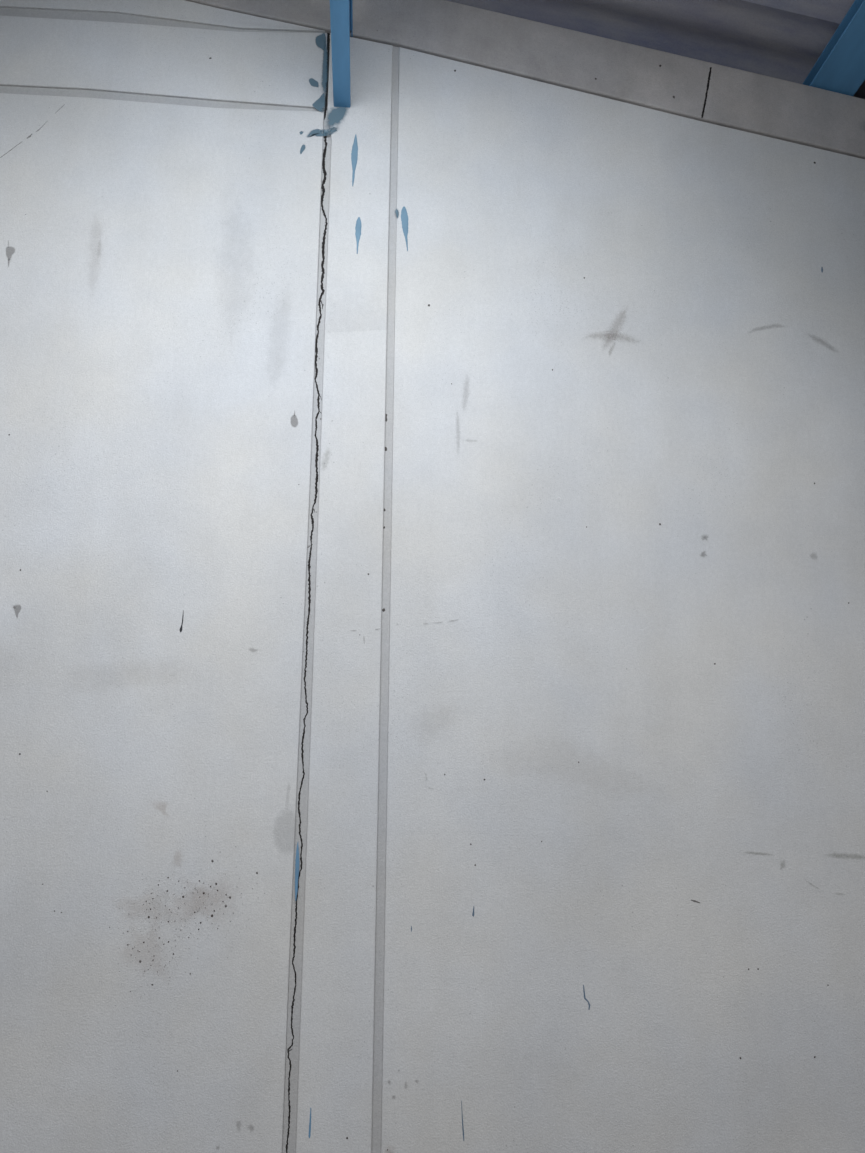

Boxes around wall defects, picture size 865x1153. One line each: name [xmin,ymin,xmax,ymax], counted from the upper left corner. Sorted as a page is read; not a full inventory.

crack [286,33,330,1153]